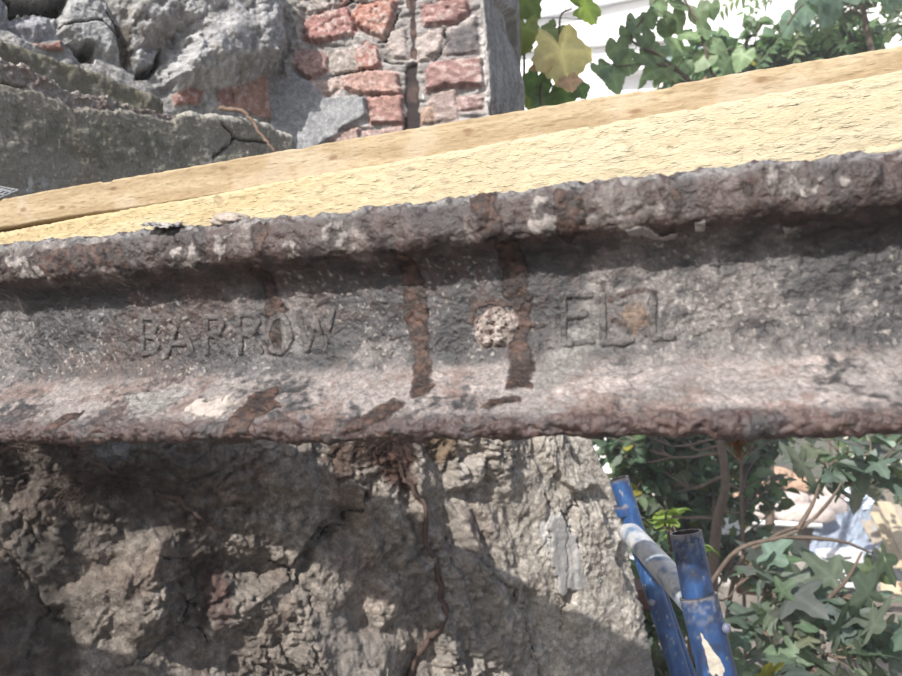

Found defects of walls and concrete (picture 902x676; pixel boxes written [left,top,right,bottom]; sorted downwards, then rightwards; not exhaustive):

crack [57,12,126,69]
crack [212,124,267,159]
rust [553,188,587,243]
rust [34,242,130,282]
rust [245,221,289,355]
rust [467,192,535,409]
rust [603,287,654,335]
rust [342,252,434,432]
rust [43,410,85,443]
rust [223,386,281,435]
rust [324,441,417,490]
rust [424,438,458,463]